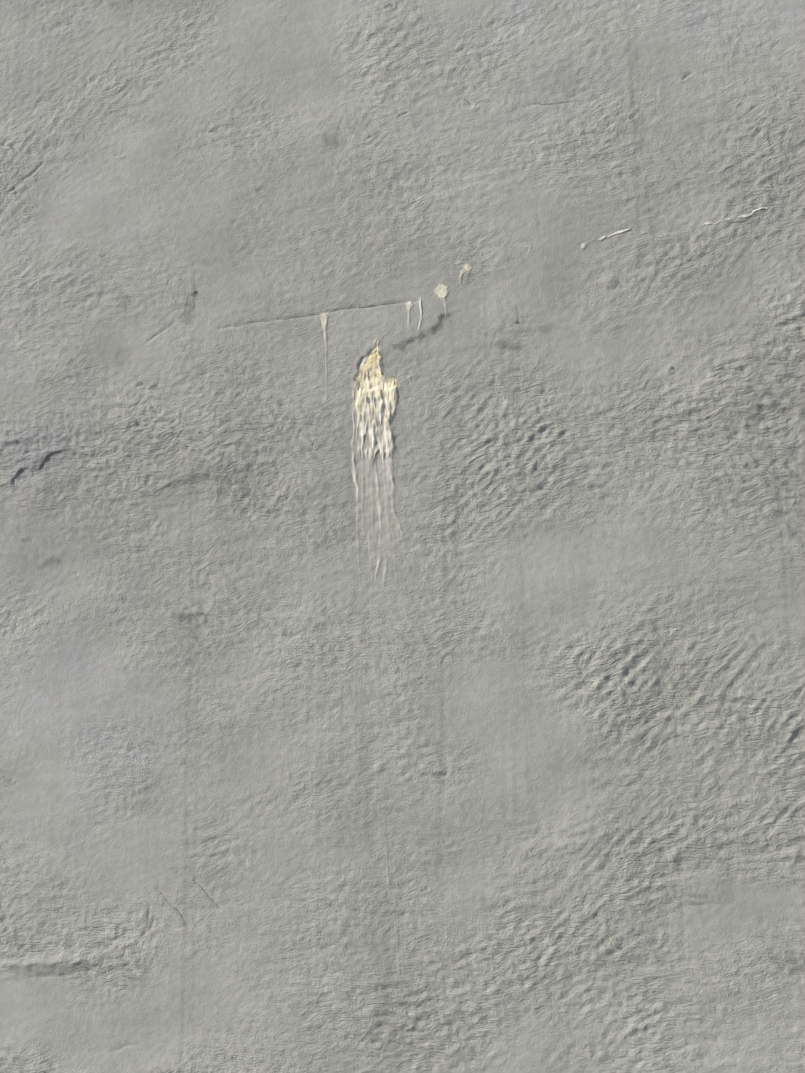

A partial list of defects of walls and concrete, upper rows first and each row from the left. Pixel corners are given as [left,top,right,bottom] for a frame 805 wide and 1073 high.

damp [351,371,396,533]